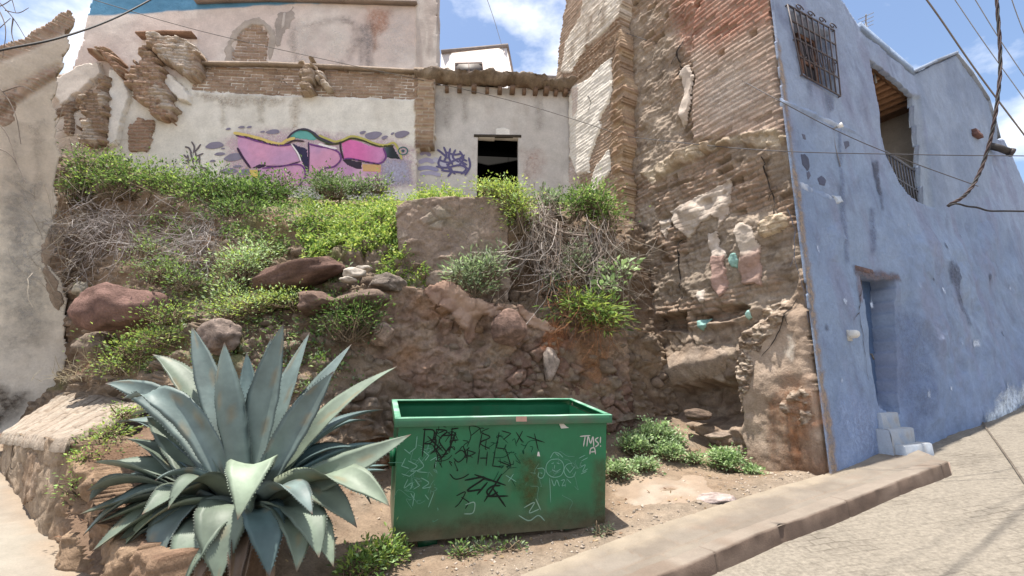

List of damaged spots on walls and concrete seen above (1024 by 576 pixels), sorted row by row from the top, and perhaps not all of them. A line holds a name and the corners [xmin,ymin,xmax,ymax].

spalling [55,6,418,153]
peeling [563,19,622,194]
crack [761,156,811,357]